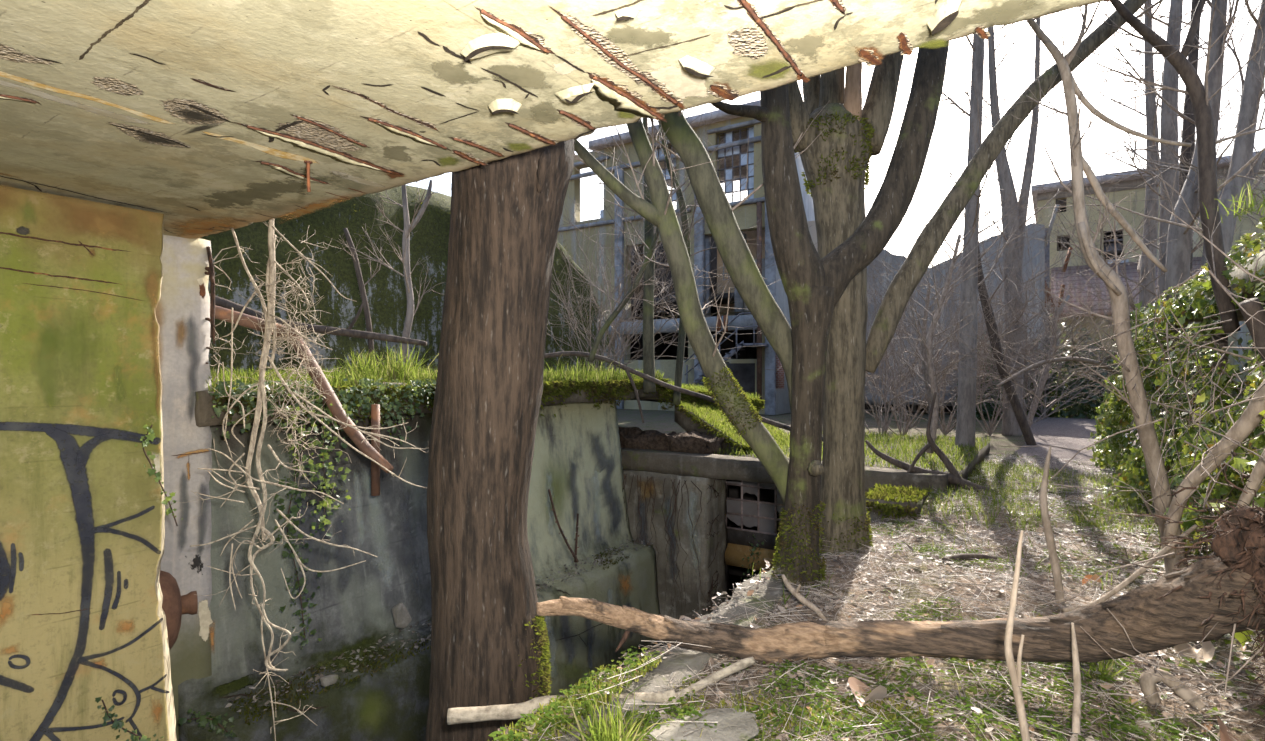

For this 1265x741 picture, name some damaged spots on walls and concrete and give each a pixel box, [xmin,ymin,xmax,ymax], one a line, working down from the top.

crack [37,0,163,64]
crack [418,32,538,98]
crack [619,34,711,58]
crack [772,0,835,14]
crack [362,83,479,124]
water stain [593,436,621,533]